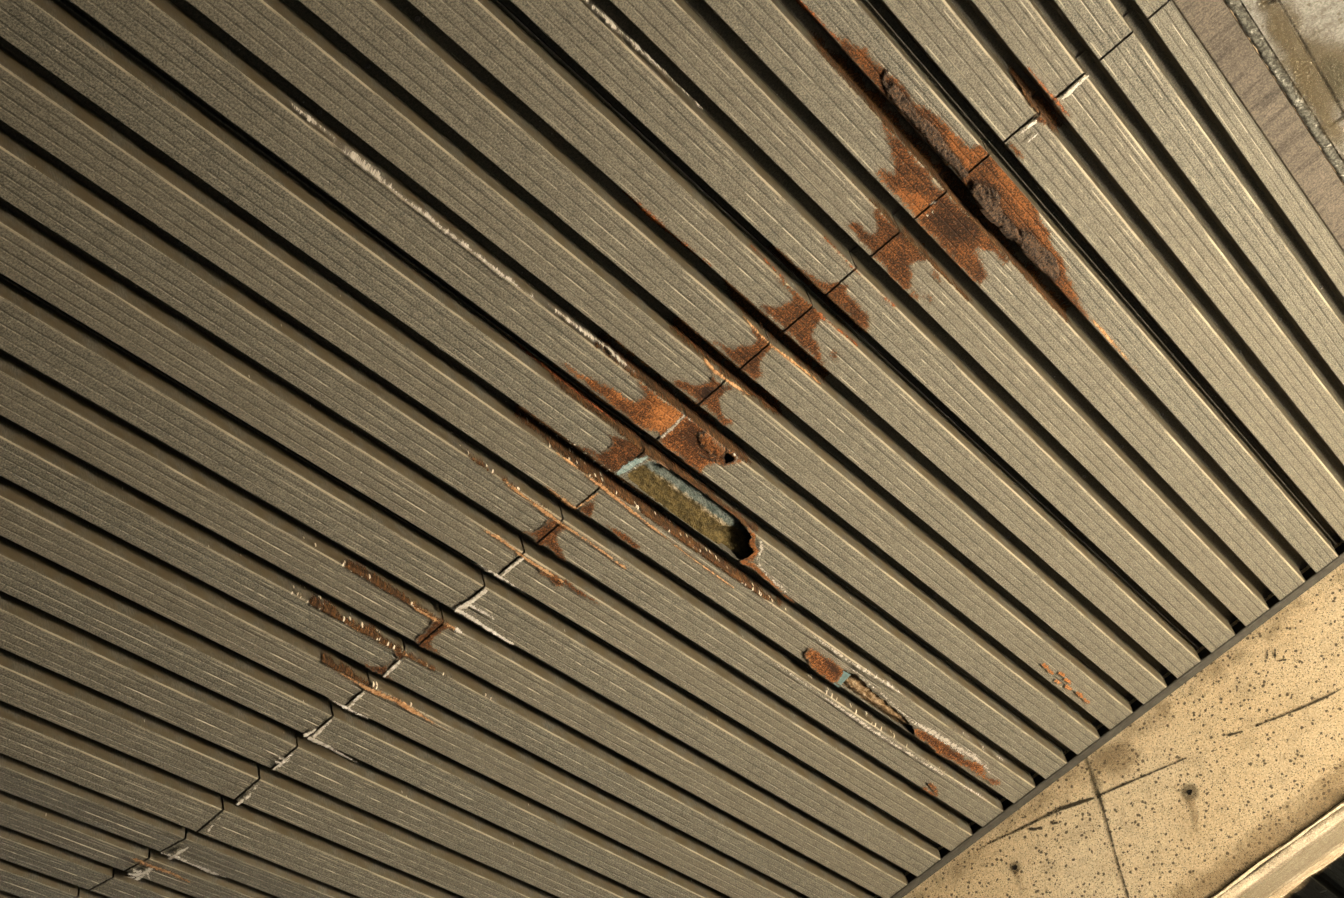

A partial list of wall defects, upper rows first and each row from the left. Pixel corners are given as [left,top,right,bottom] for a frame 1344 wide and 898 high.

corrosion [622,191,712,266]
corrosion [795,0,1135,369]
corrosion [451,236,871,610]
spalling [616,451,754,559]
corrosion [291,559,456,730]
corrosion [914,729,1001,786]
crack [1228,687,1344,737]
crack [979,758,1187,898]